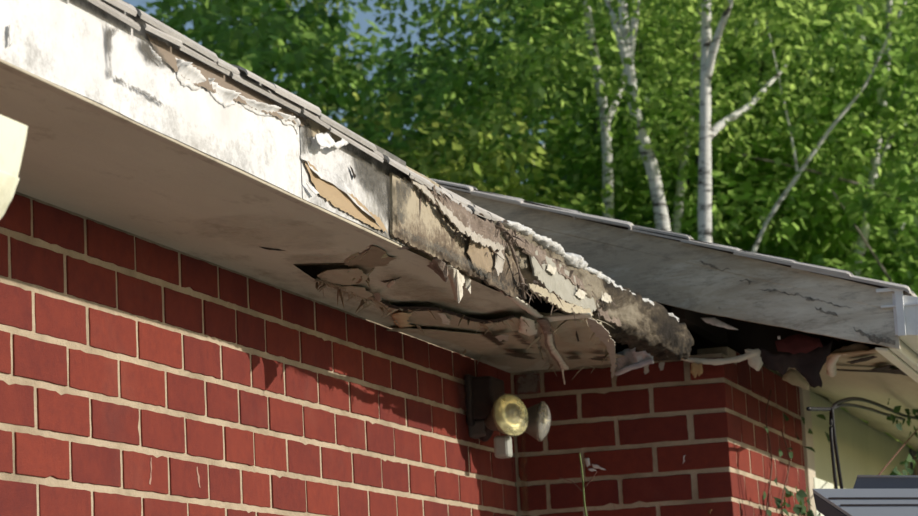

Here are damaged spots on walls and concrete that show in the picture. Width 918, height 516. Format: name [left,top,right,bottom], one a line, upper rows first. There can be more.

damp [101,12,118,77]
damp [141,40,167,66]
peeling [145,33,351,149]
peeling [300,154,387,233]
damp [356,158,502,285]
peeling [344,246,396,289]
peeling [427,258,471,303]
peeling [494,249,505,277]
crack [695,261,908,376]
peeling [536,319,569,385]